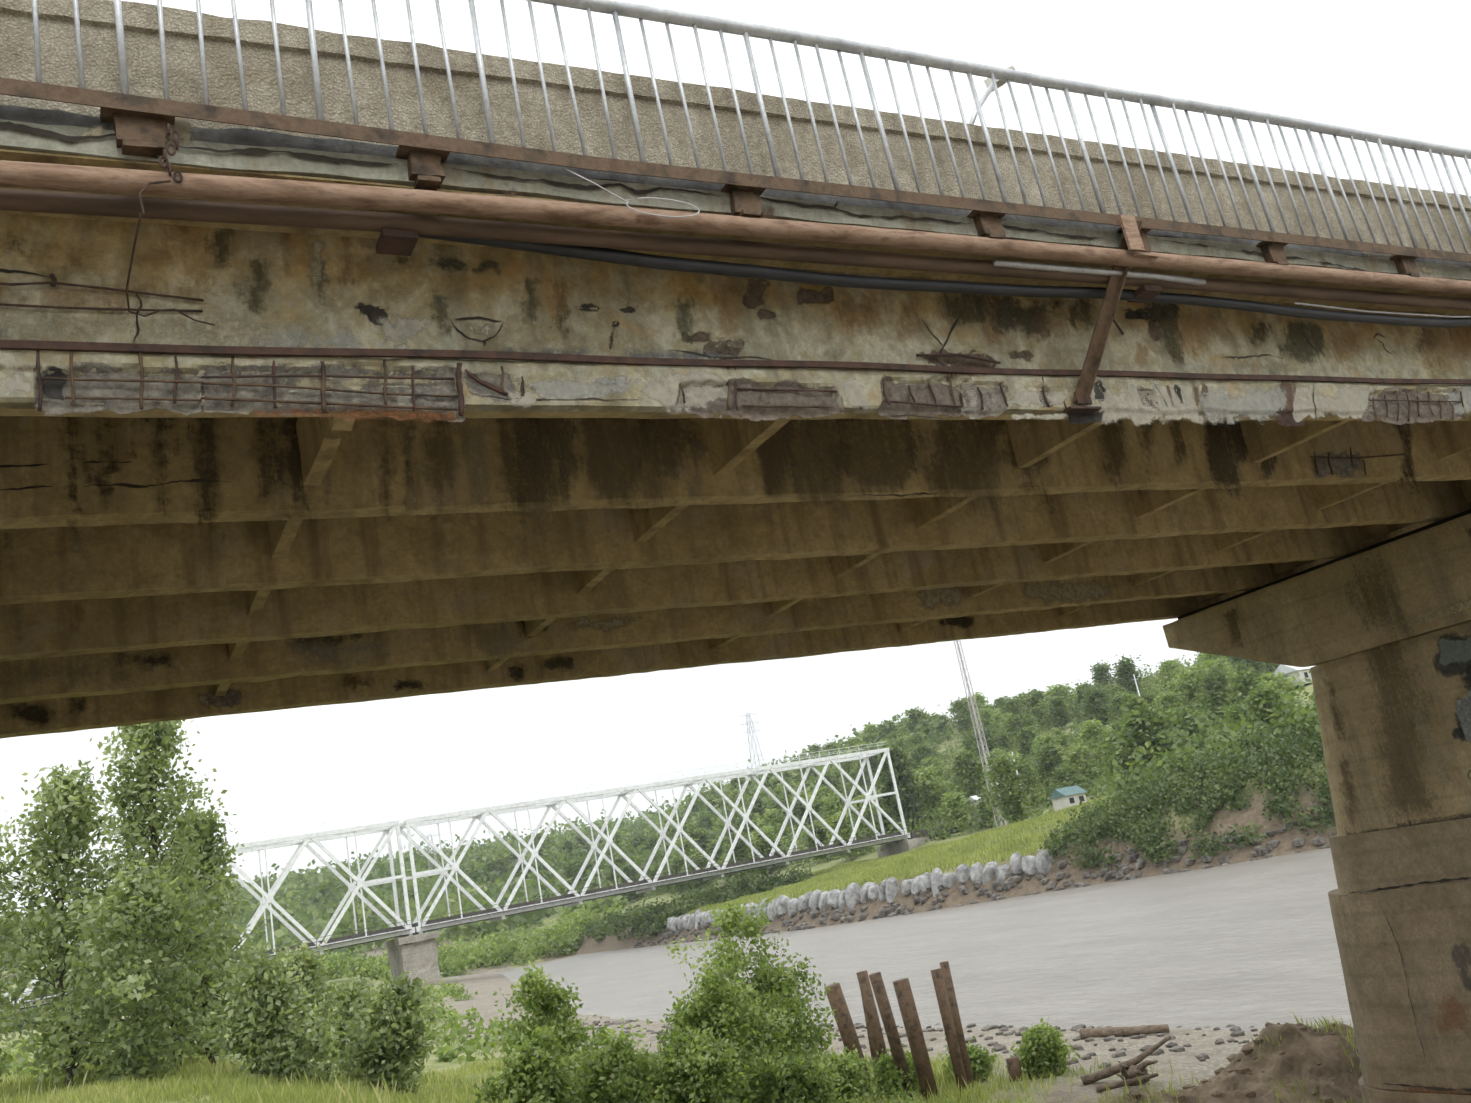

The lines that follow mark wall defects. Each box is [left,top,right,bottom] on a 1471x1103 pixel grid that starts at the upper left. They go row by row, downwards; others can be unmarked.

crack [0,122,116,143]
crack [0,268,49,277]
crack [133,293,142,343]
spalling [0,303,1471,425]
damp [943,293,1095,336]
damp [1251,321,1324,362]
crack [0,460,226,490]
damp [256,417,327,519]
damp [380,418,704,528]
damp [756,419,1053,518]
damp [1100,420,1154,477]
spalling [1310,447,1405,479]